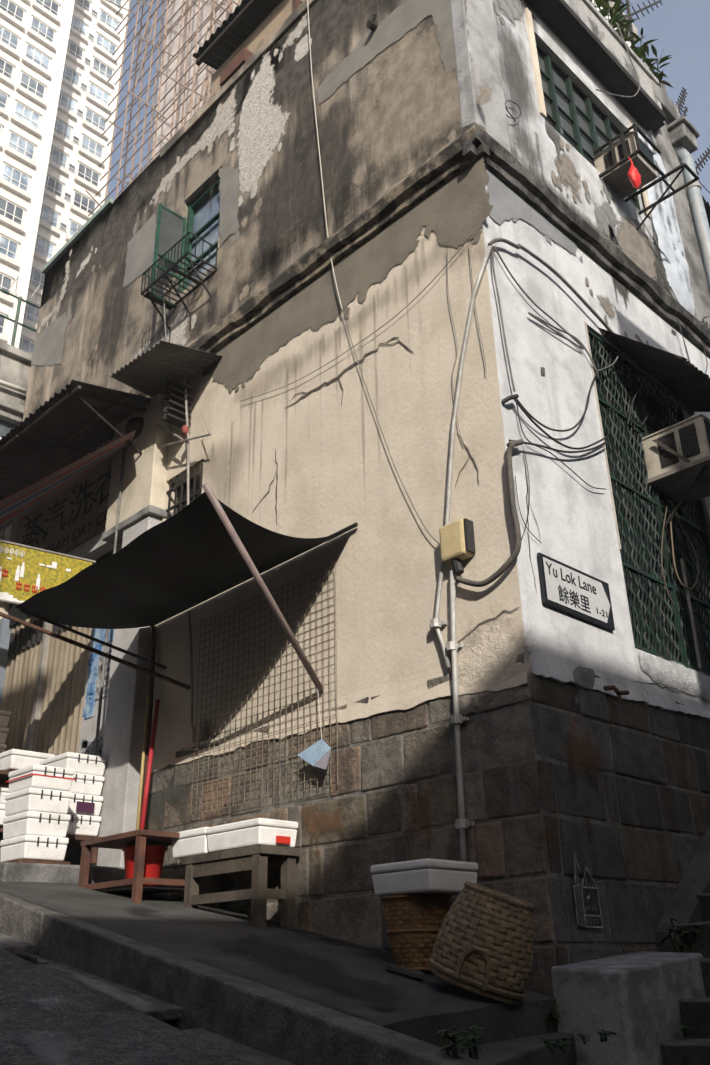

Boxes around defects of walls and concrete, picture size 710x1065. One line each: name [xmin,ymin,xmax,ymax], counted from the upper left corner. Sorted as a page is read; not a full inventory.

water stain [51,44,264,374]
flaking render [145,11,312,316]
water stain [194,0,393,336]
flaking render [545,120,658,278]
crack [285,337,414,408]